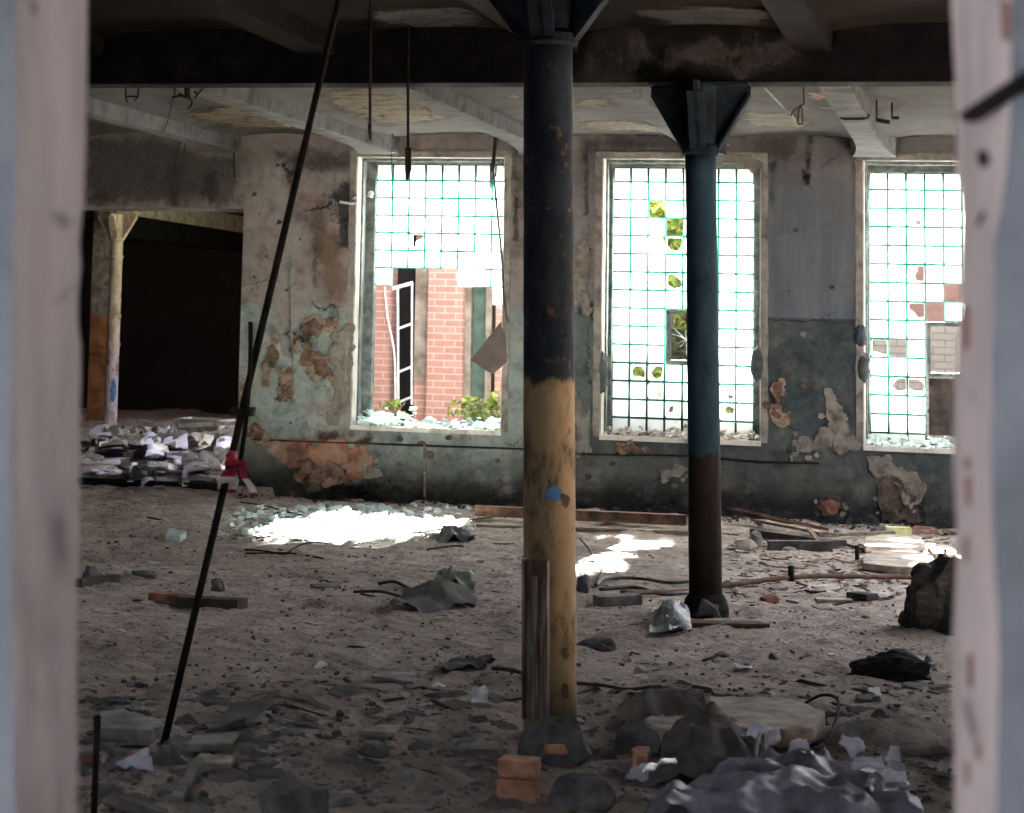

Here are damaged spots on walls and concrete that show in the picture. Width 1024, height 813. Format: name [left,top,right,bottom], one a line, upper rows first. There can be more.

leakage [187,106,295,129]
leakage [321,88,451,127]
flaking render [246,314,384,488]
flaking render [763,372,928,525]
flaking render [658,463,688,490]